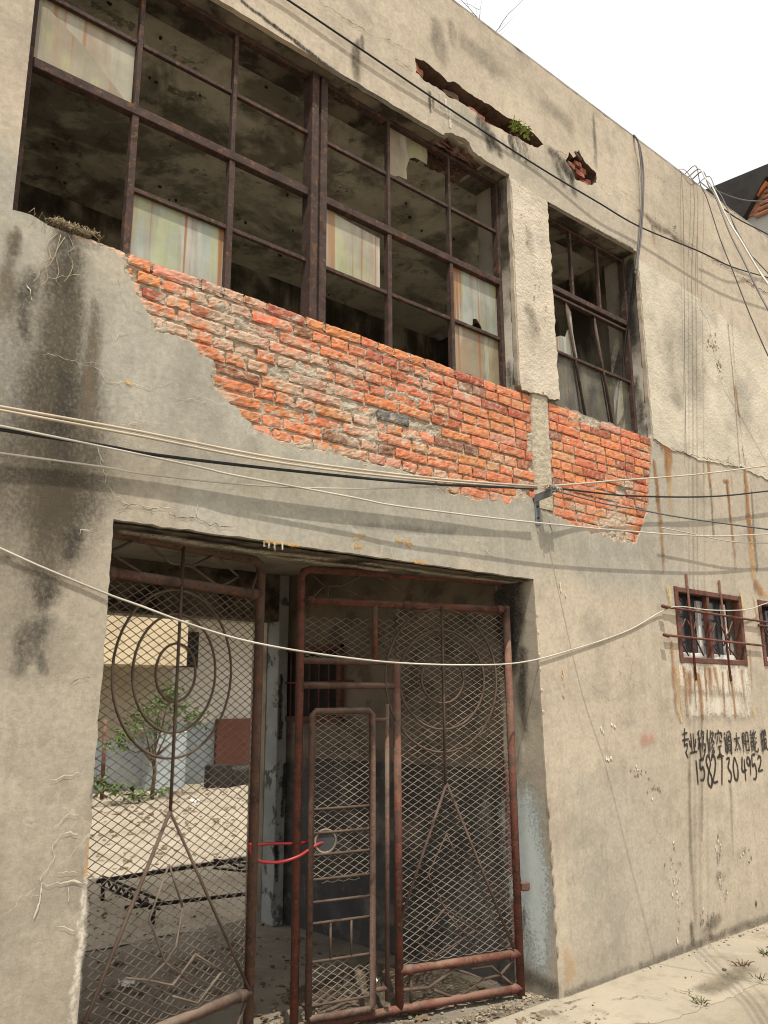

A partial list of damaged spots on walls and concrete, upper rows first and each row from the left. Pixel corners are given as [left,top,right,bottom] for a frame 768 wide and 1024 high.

spalling [441,89,496,127]
spalling [567,150,591,185]
water stain [31,232,98,584]
spalling [72,234,650,544]
crack [93,447,229,527]
corrosion [653,444,672,559]
corrosion [708,461,734,541]
corrosion [744,470,766,595]
corrosion [671,641,743,719]
crack [31,772,97,943]